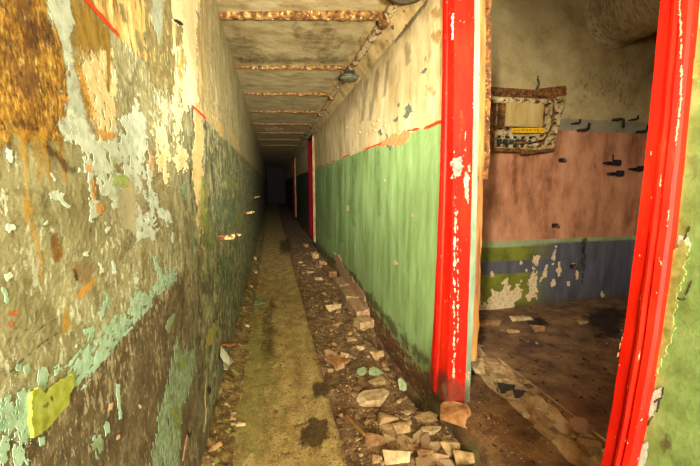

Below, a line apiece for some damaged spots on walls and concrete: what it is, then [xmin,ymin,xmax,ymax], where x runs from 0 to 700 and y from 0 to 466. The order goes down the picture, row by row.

corrosion [0,0,74,173]
peeling [47,0,208,250]
peeling [378,103,413,150]
peeling [692,57,700,87]
peeling [0,255,177,466]
peeling [149,338,197,466]
peeling [479,245,562,310]
peeling [638,442,648,466]
peeling [649,387,662,420]
peeling [655,235,692,376]